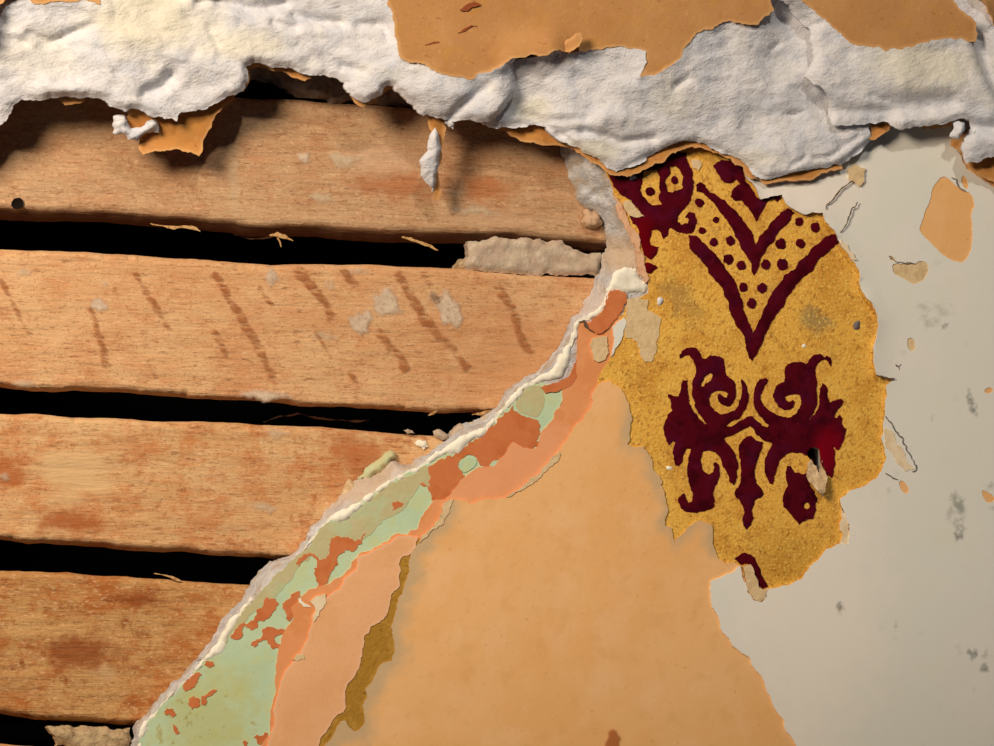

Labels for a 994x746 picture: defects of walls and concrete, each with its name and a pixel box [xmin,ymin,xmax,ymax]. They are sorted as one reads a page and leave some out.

peeling [138,362,577,746]
peeling [587,290,627,356]
peeling [710,121,994,746]